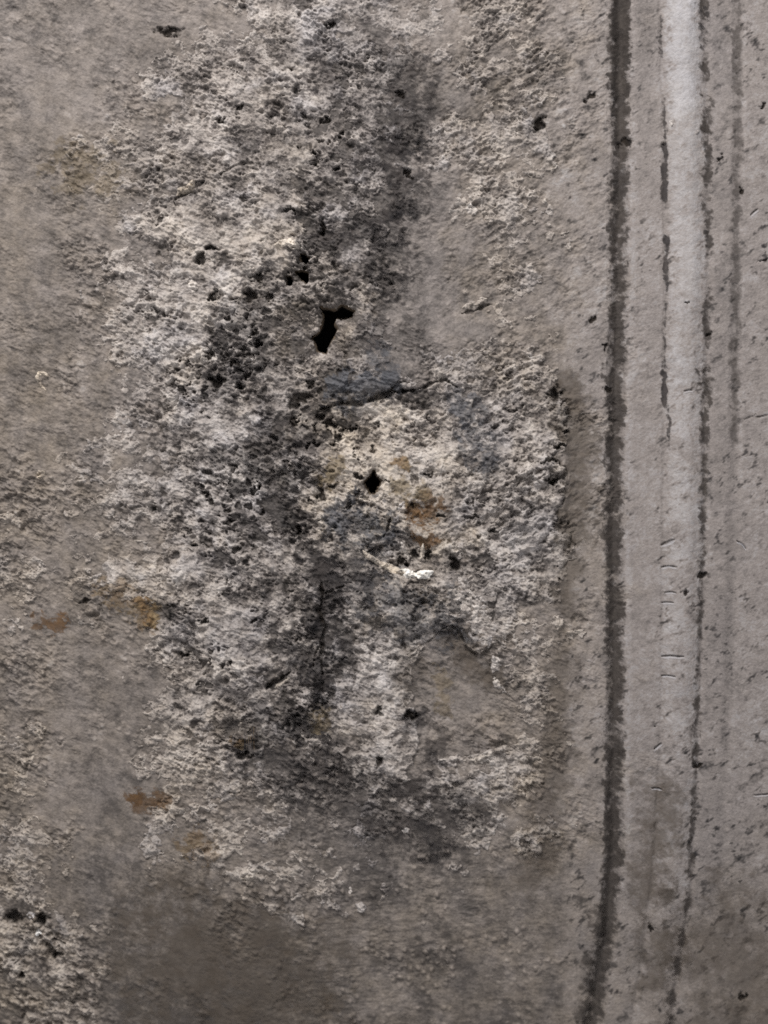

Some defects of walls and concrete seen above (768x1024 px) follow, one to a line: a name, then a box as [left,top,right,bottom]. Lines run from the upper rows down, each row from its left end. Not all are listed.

water stain [313,137,433,258]
spalling [533,117,545,131]
water stain [605,0,631,96]
water stain [700,94,714,133]
peeling [462,297,488,309]
water stain [660,235,671,438]
corrosion [63,0,584,930]
water stain [550,372,601,546]
peeling [360,545,587,748]
water stain [685,657,701,877]